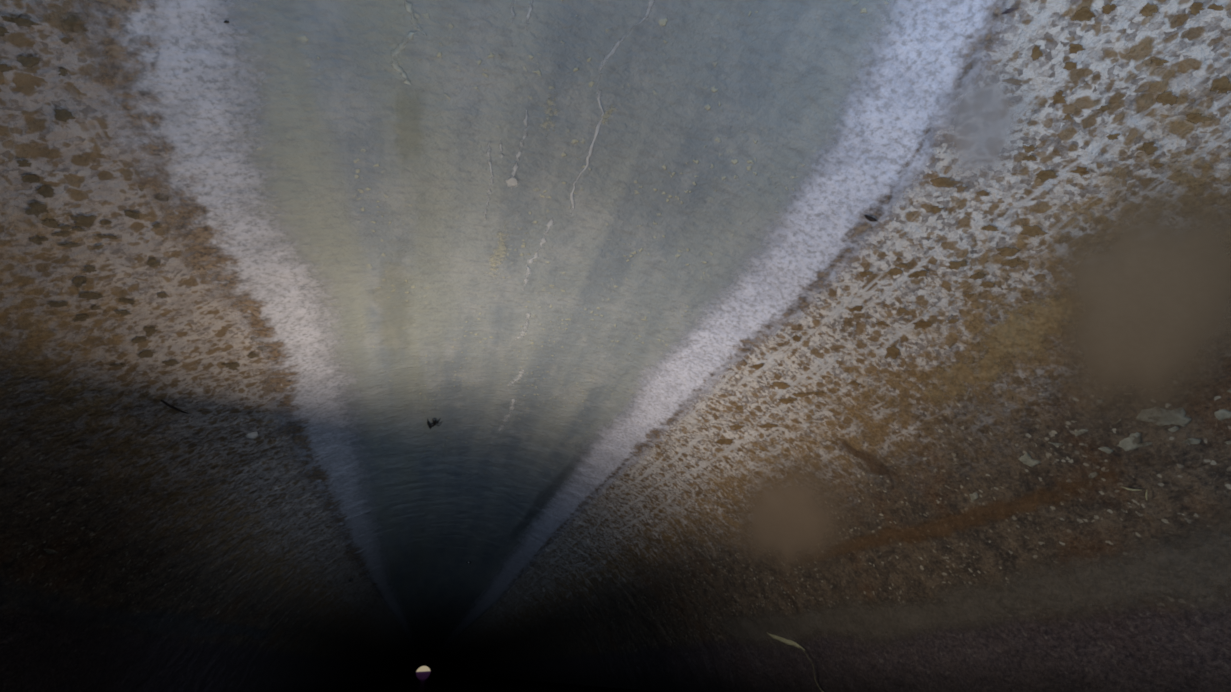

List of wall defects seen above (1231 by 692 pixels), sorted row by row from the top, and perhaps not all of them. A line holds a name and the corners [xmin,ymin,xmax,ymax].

crack [515,96,604,340]
crack [499,370,524,431]
peeling [1098,407,1202,454]
peeling [1214,409,1231,421]